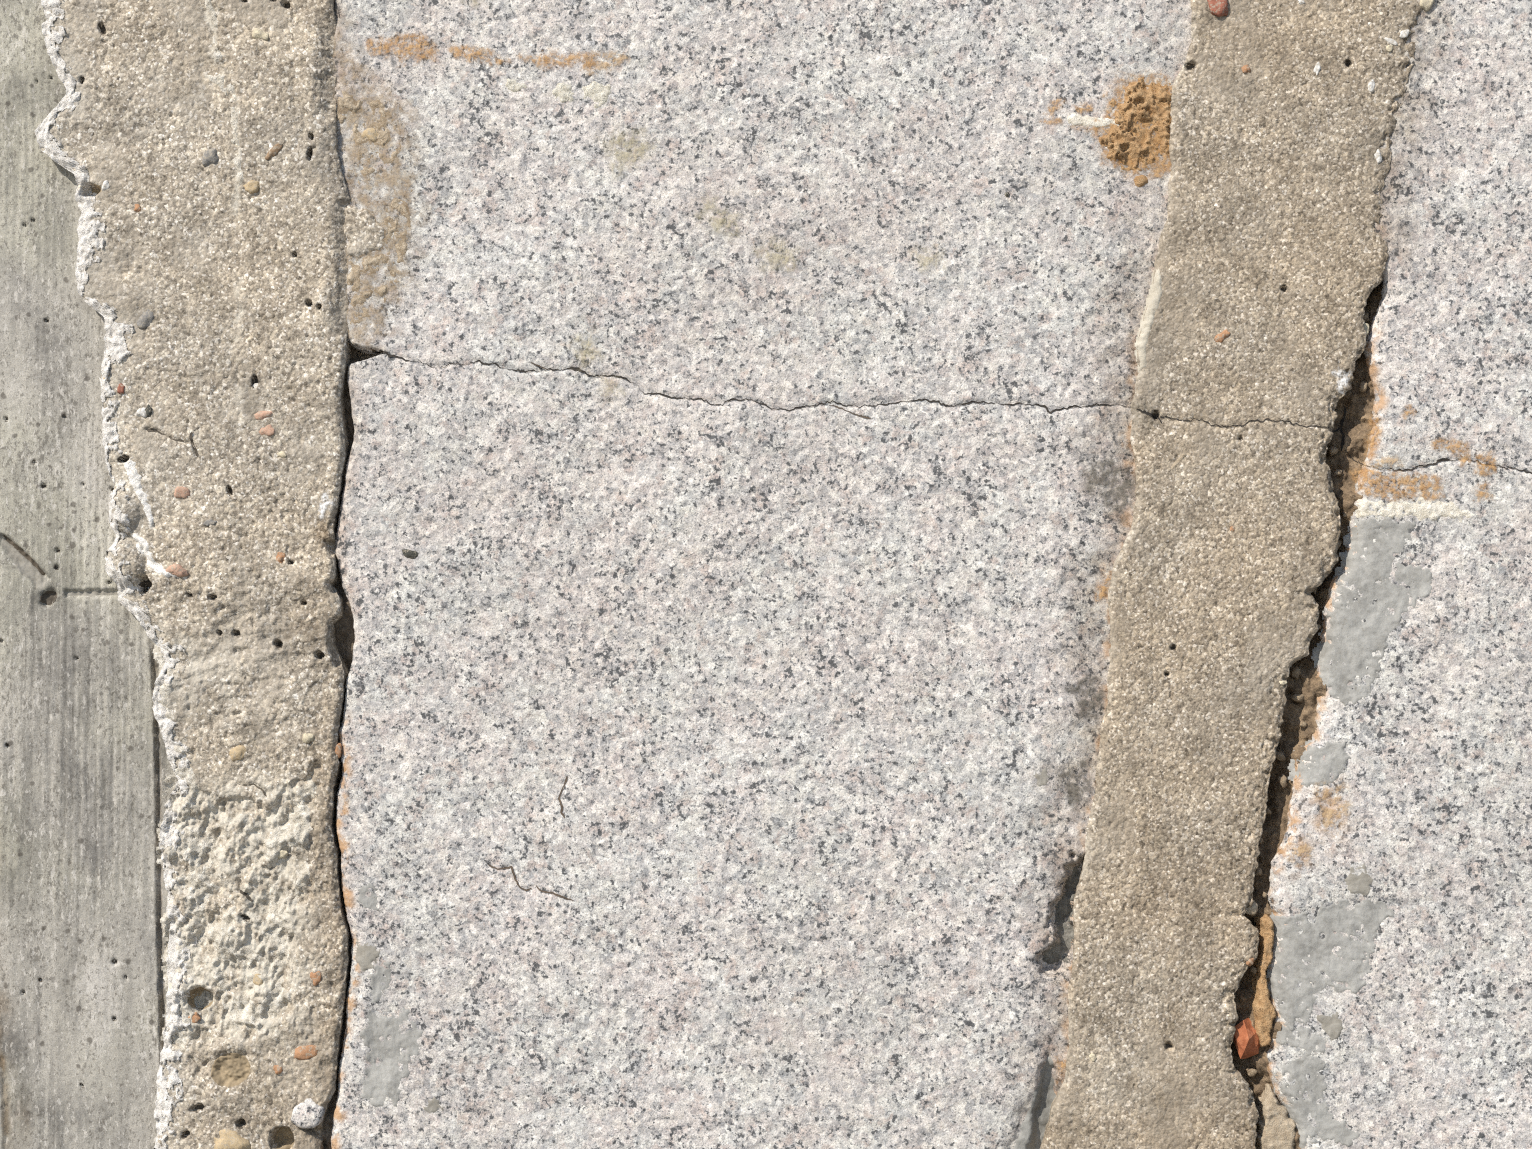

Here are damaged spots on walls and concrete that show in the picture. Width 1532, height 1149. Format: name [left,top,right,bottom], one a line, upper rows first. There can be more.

spalling [35,0,318,1149]
crack [352,346,1532,473]